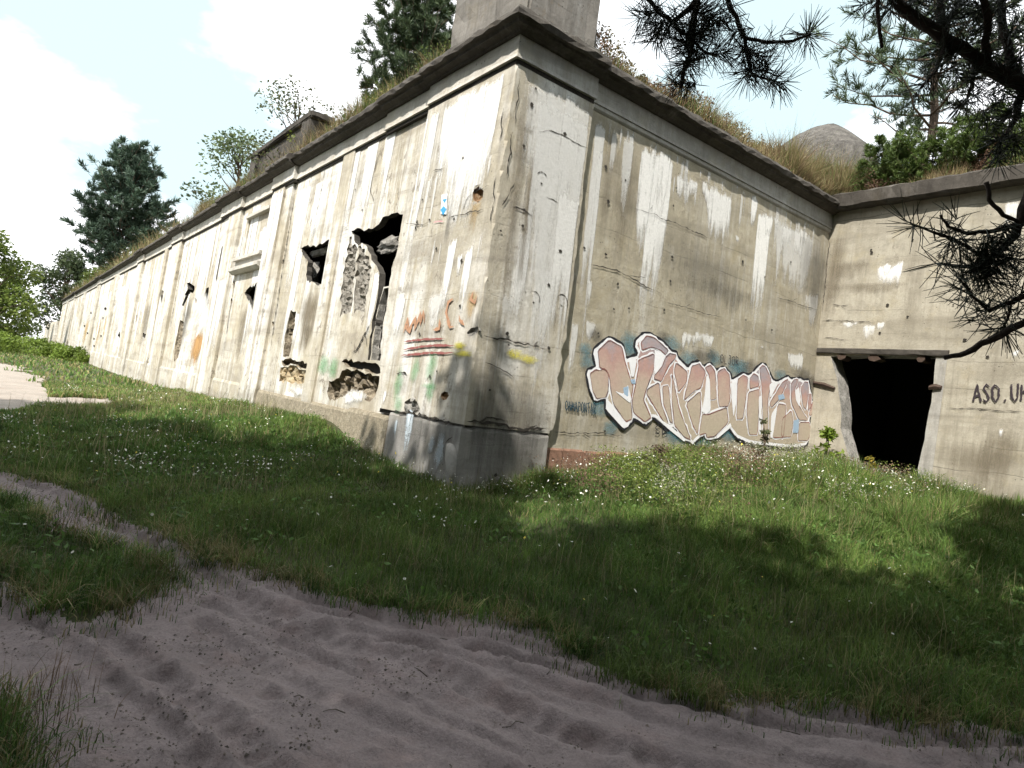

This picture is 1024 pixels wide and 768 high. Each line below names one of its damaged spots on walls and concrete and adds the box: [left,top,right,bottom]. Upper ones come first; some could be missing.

damp [393,74,504,333]
damp [514,88,818,369]
rust [191,334,203,363]
spalling [279,310,306,397]
spalling [327,369,379,403]
spalling [340,236,389,361]